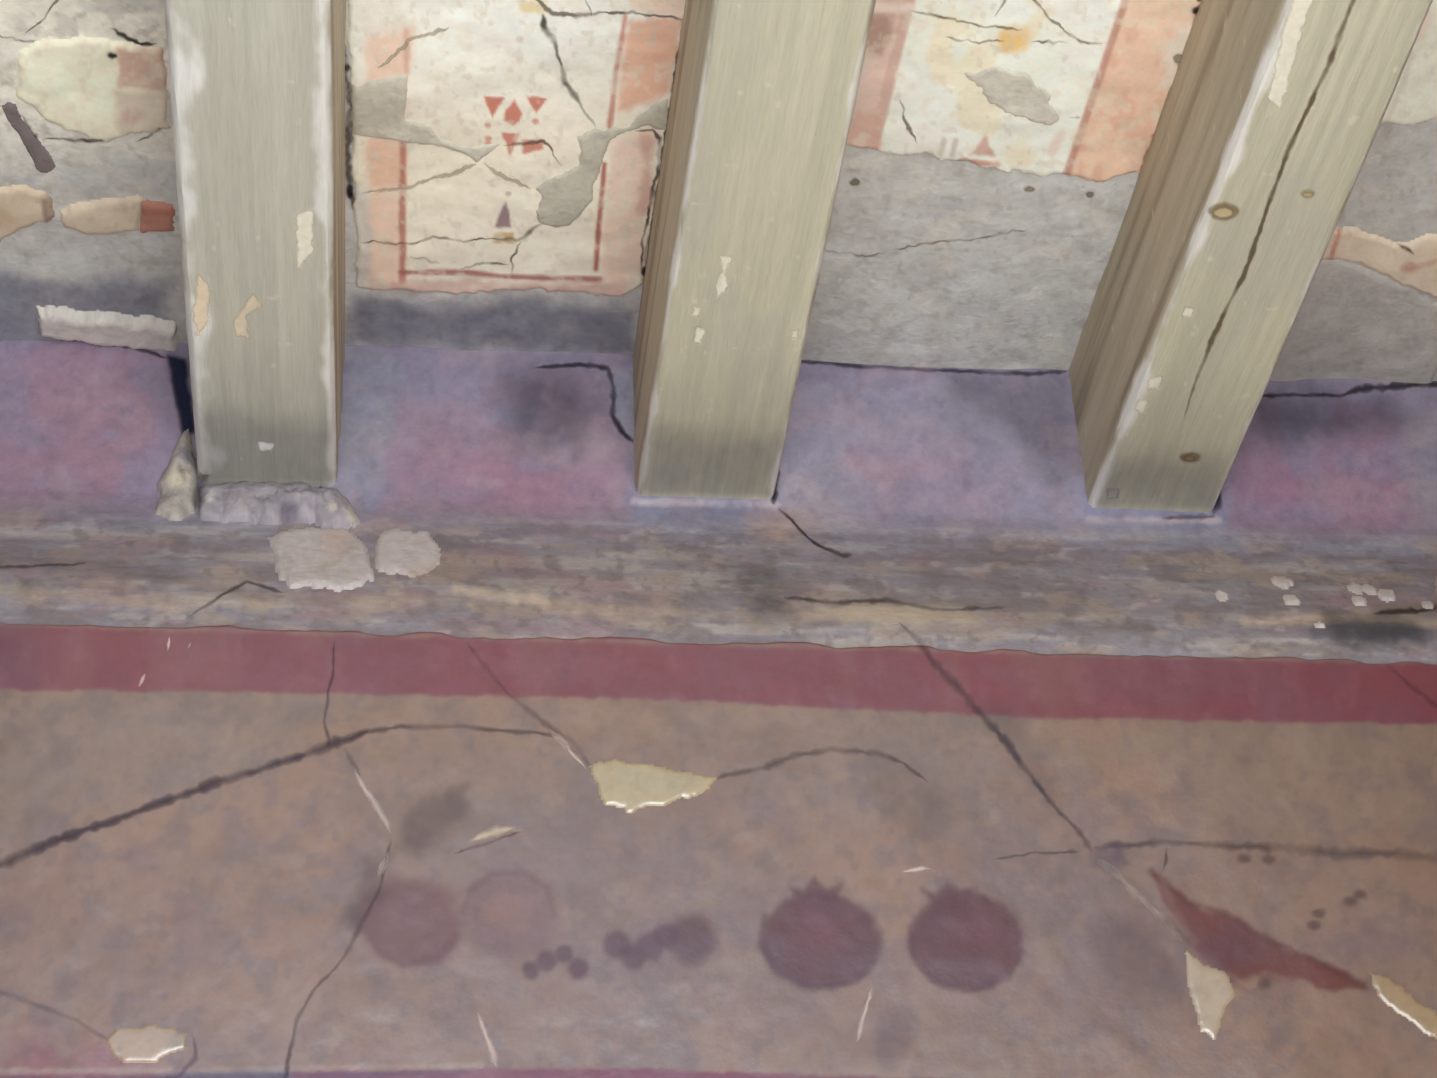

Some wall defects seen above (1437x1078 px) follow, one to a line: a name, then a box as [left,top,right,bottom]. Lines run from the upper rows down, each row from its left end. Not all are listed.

crack [114,29,155,46]
crack [379,29,446,67]
crack [537,0,678,100]
crack [365,140,555,193]
crack [640,129,661,264]
crack [367,229,533,265]
crack [539,363,632,441]
crack [8,733,389,874]
spalling [588,758,717,813]
crack [460,827,516,852]
spalling [1184,950,1235,1040]
spalling [1369,972,1437,1039]